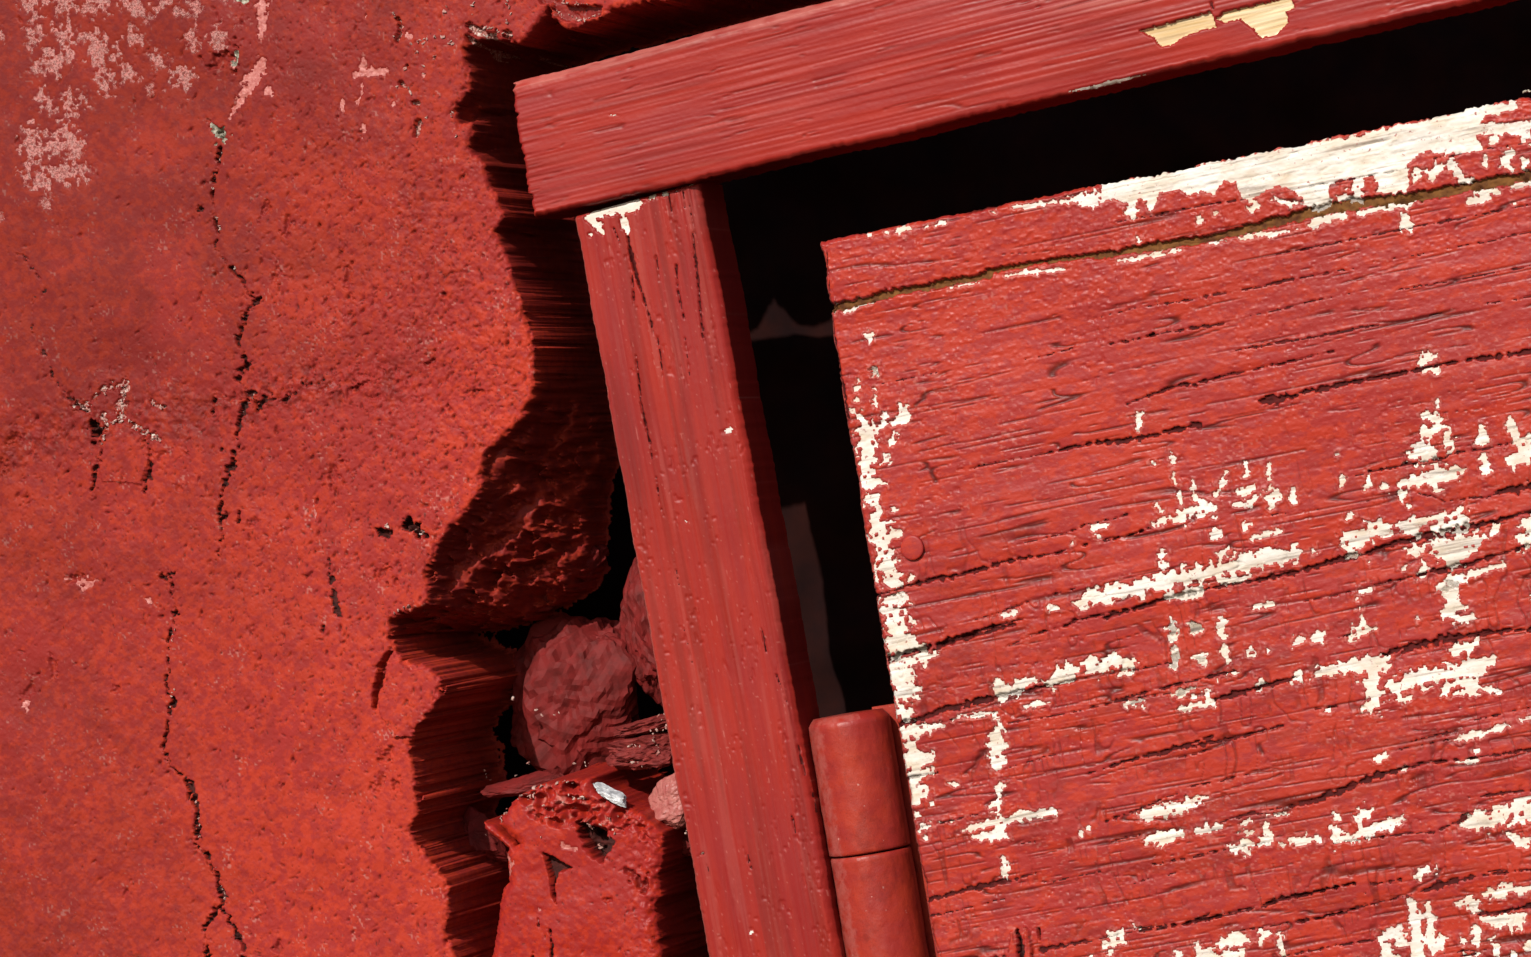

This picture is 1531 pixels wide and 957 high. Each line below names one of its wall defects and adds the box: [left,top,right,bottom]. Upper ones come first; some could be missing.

peeling [15,0,274,209]
peeling [1140,0,1294,46]
peeling [992,100,1531,263]
crack [197,147,325,556]
peeling [849,366,1140,880]
peeling [1047,452,1318,713]
peeling [1289,398,1531,717]
crack [160,571,247,957]
peeling [1173,928,1286,957]
peeling [1136,795,1406,858]
peeling [1378,882,1531,957]
peeling [1459,796,1531,849]